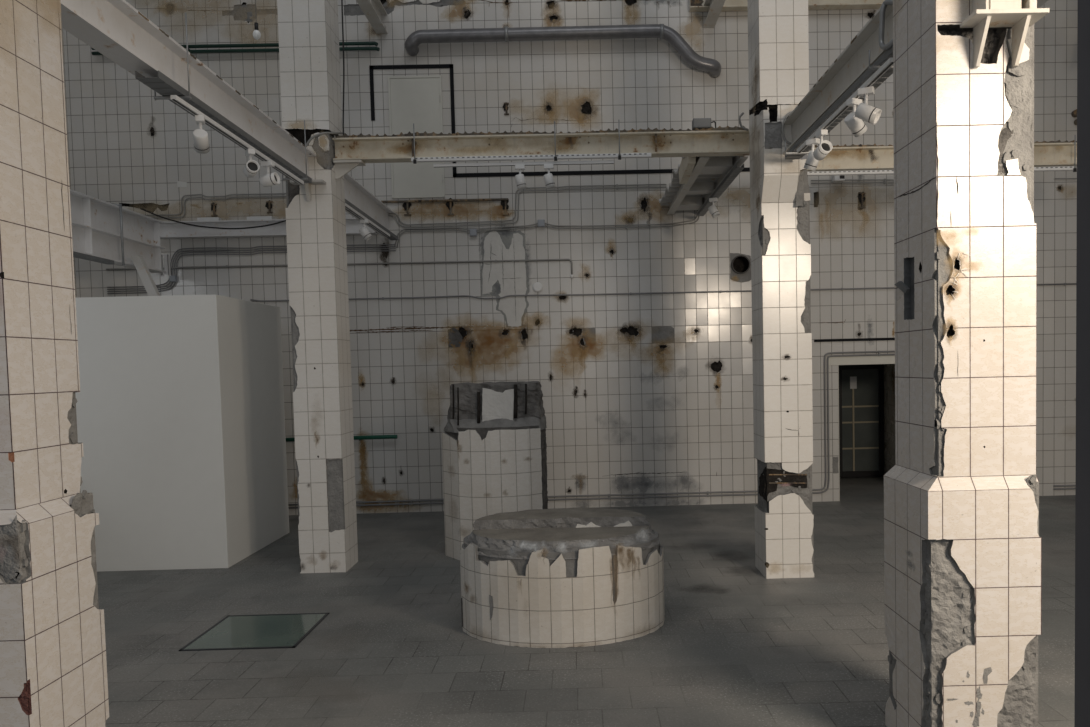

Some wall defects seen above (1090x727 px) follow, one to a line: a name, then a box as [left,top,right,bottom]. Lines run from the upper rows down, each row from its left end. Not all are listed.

rust [558,137,577,150]
rust [544,97,592,123]
spalling [997,26,1032,205]
spalling [796,170,809,244]
rust [442,319,541,370]
rust [559,327,602,370]
spalling [931,233,952,476]
rust [359,440,407,511]
spalling [757,459,810,513]
spalling [0,515,28,584]
spalling [922,539,992,727]
spalling [997,636,1036,727]